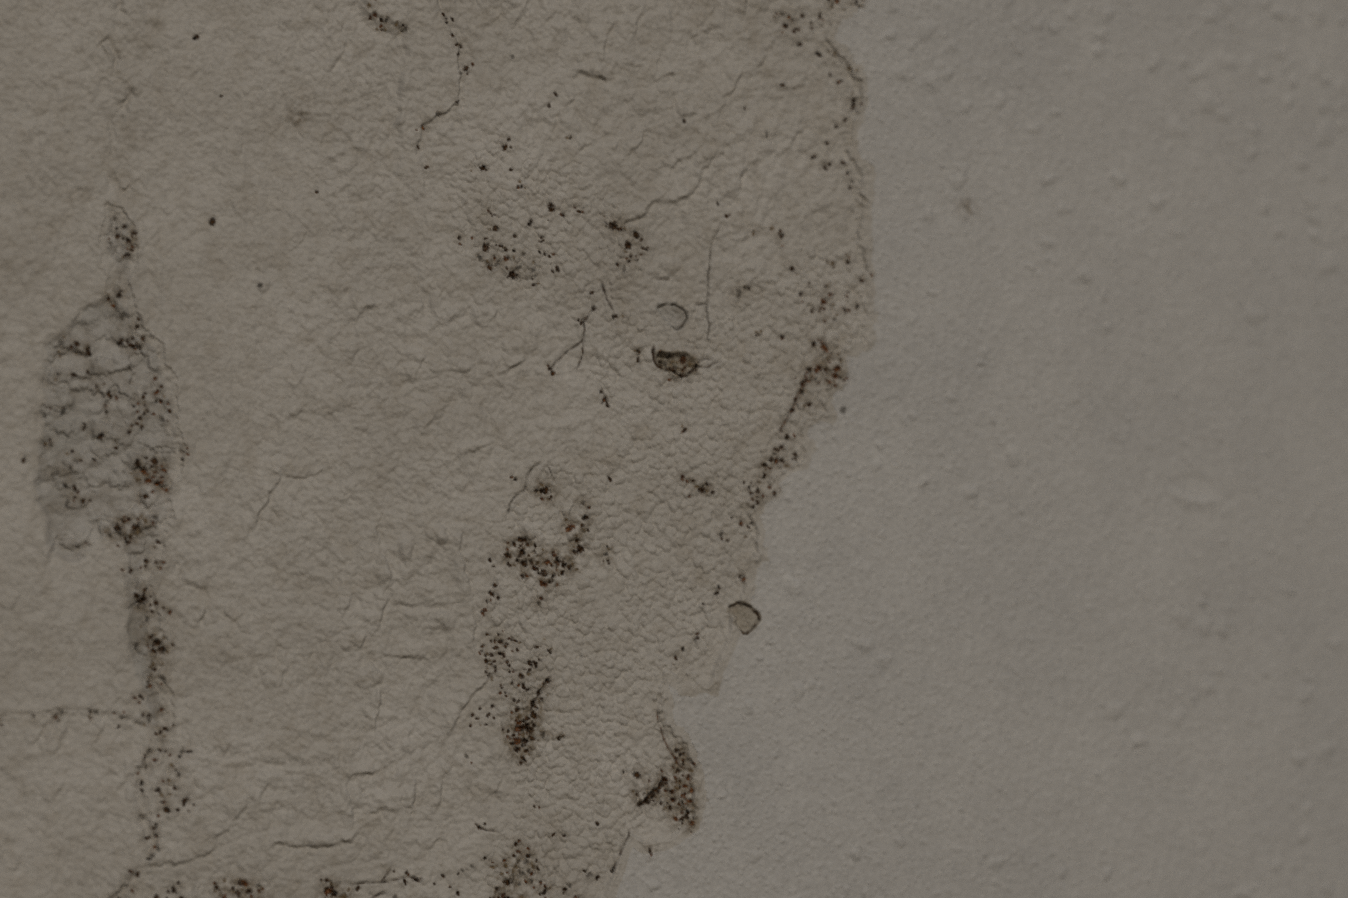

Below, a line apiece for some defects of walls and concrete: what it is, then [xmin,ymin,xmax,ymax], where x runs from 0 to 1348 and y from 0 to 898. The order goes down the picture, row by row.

peeling [0,0,879,898]